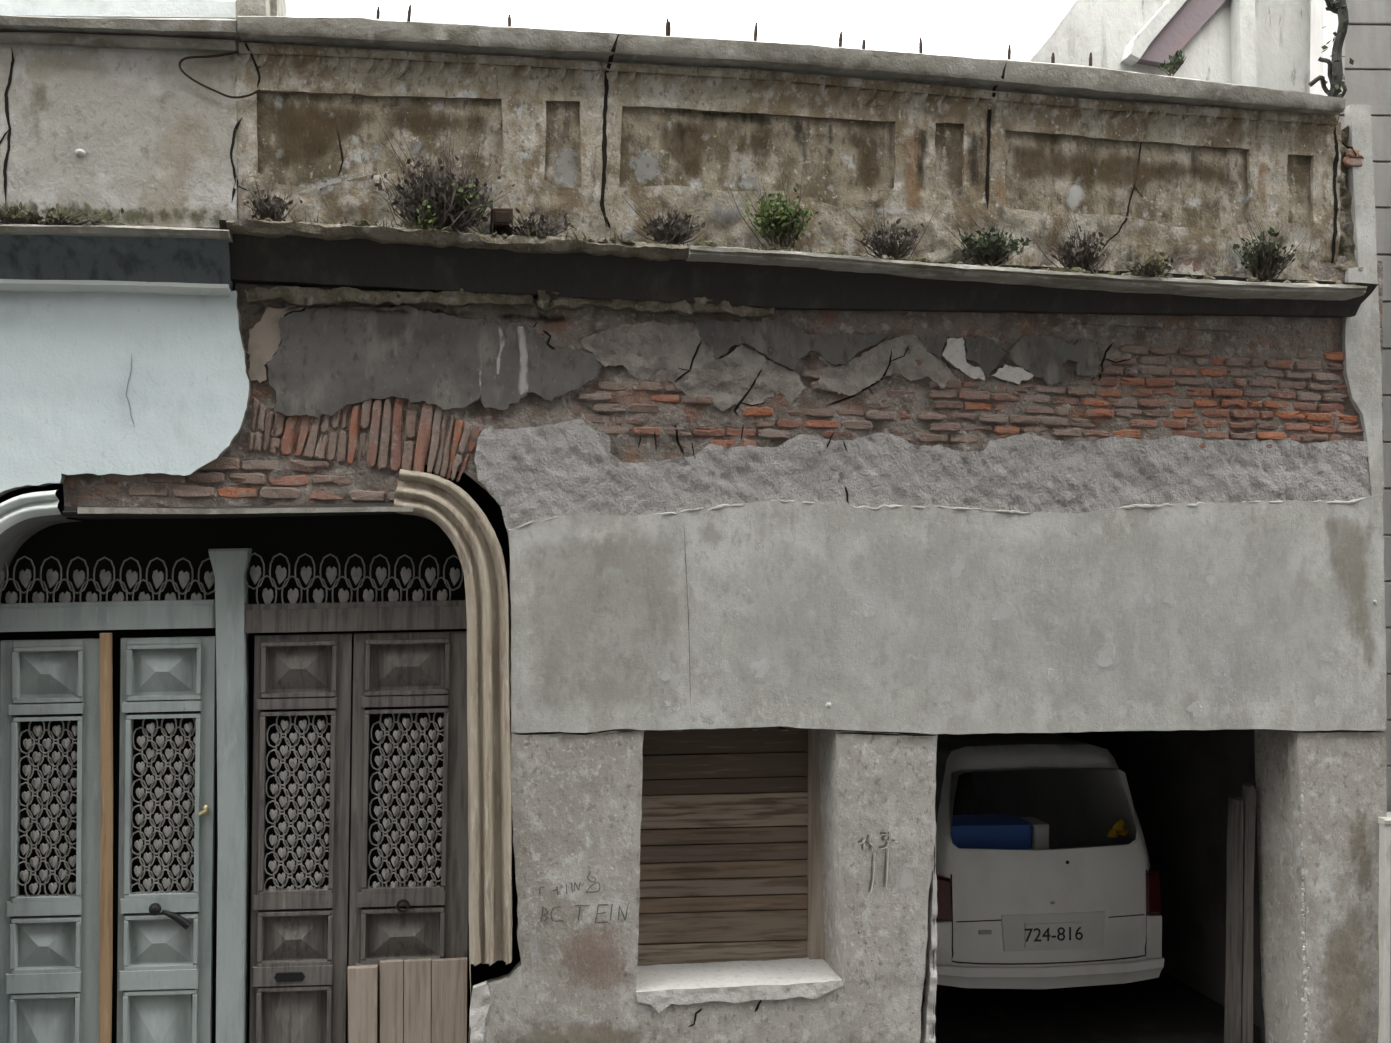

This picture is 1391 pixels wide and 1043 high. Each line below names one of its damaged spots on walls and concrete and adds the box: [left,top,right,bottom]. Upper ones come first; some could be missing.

crack [0,47,15,205]
water stain [668,111,767,174]
water stain [851,137,879,185]
water stain [916,129,926,188]
water stain [969,135,979,182]
crack [1101,135,1145,251]
peeling [90,305,1364,502]